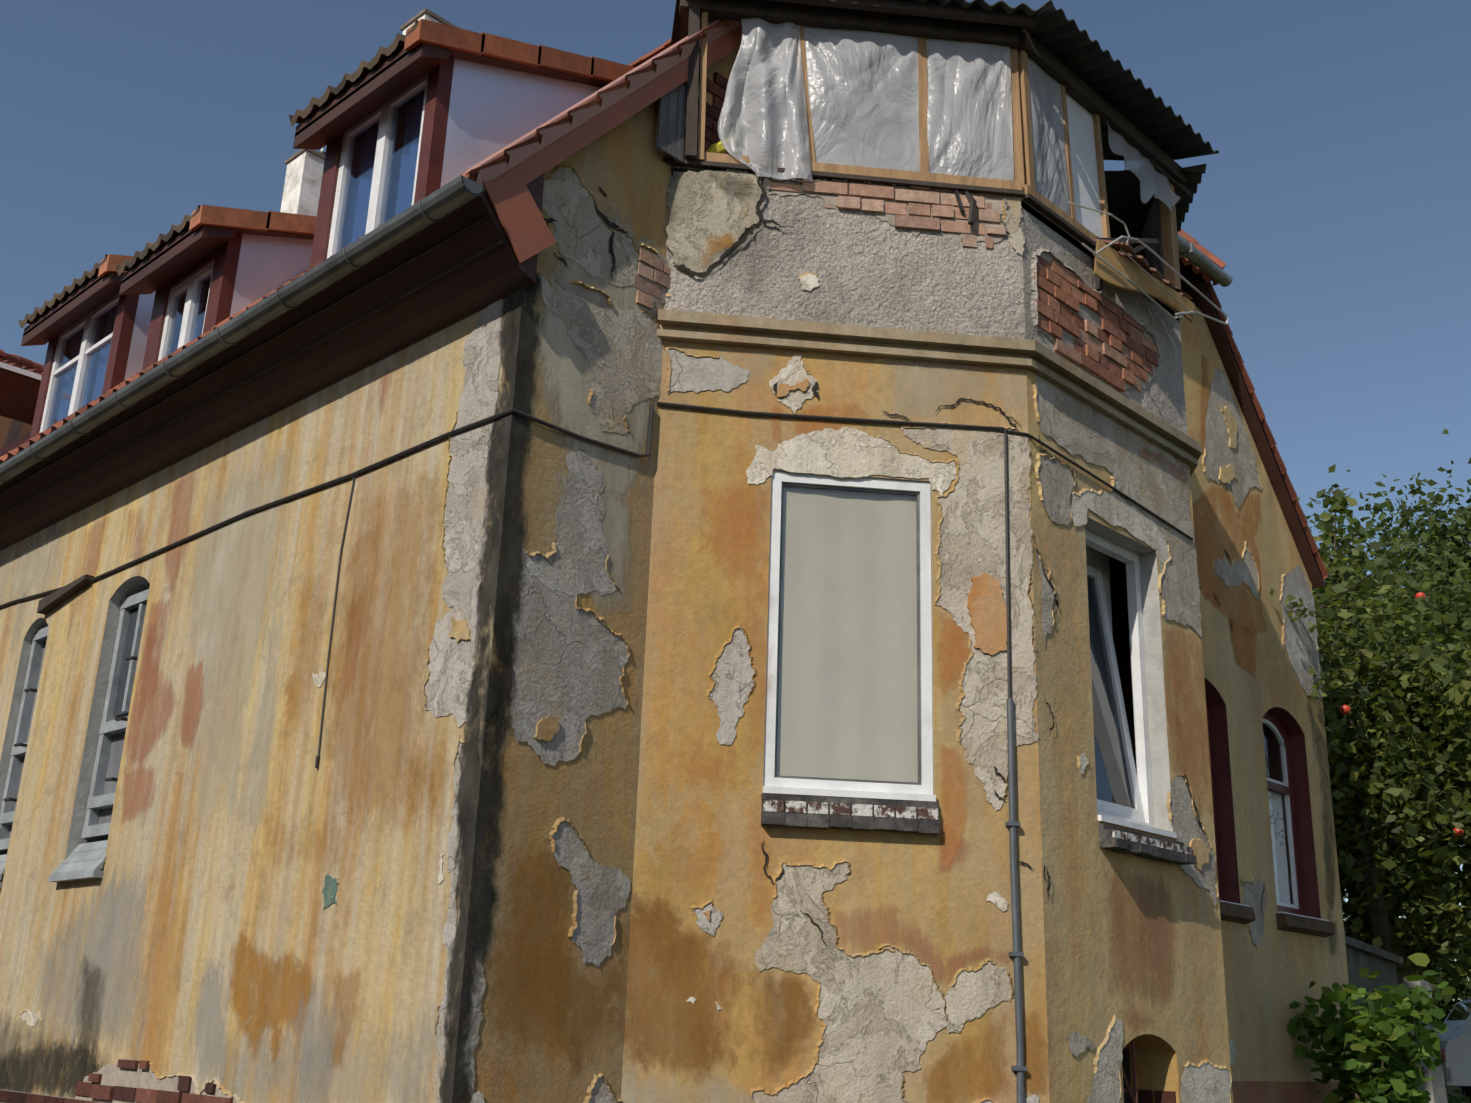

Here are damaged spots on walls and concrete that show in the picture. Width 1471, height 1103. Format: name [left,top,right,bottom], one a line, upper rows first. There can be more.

flaking render [538,164,750,434]
crack [673,176,796,275]
flaking render [769,354,818,414]
flaking render [763,177,1160,392]
rust [124,605,202,818]
flaking render [424,299,502,1103]
water stain [439,213,661,1103]
flaking render [510,449,630,766]
flaking render [746,367,1263,811]
flaking render [74,1058,245,1103]
water stain [624,901,723,1069]
flaking render [750,858,1015,1103]